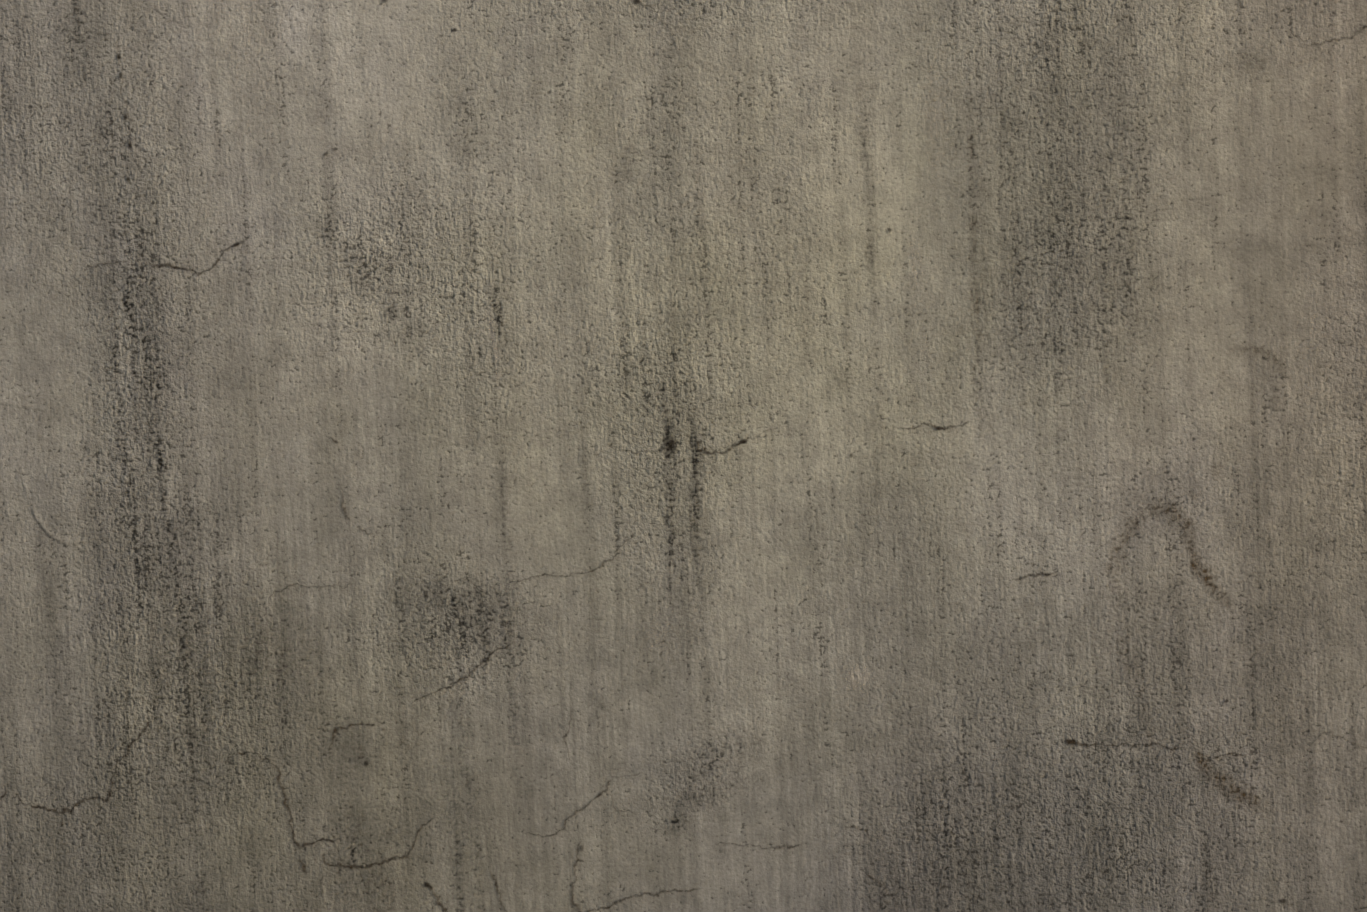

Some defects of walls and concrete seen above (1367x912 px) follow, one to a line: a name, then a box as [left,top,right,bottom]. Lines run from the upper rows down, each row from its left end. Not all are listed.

crack [155,241,243,276]
damp [666,419,675,566]
crack [1,722,149,813]
crack [332,723,401,740]
crack [1066,740,1176,750]
crack [240,752,447,912]
crack [538,781,694,912]